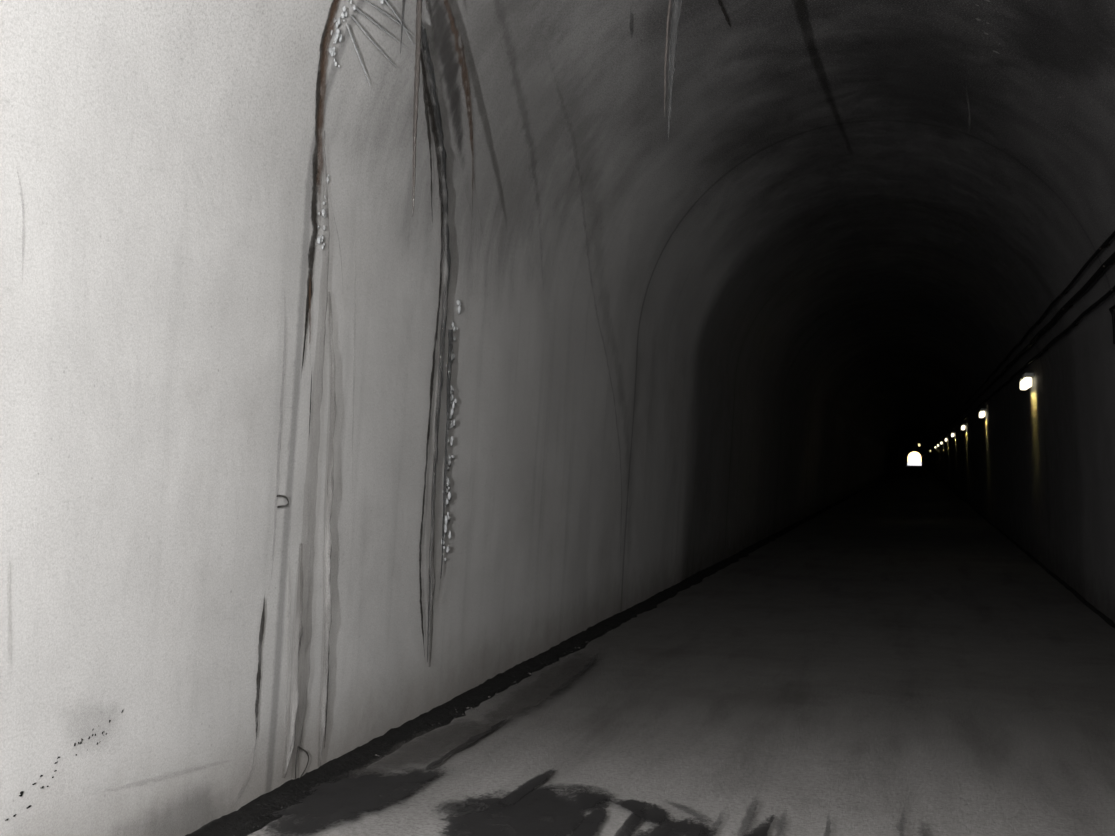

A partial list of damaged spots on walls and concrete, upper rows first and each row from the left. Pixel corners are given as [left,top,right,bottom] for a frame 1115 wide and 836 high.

water stain [431,0,474,201]
water stain [419,48,444,656]
water stain [440,770,715,836]